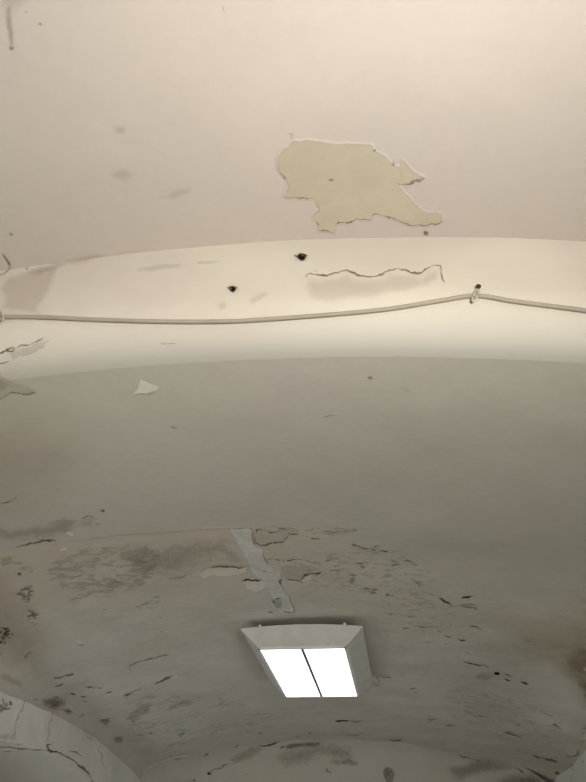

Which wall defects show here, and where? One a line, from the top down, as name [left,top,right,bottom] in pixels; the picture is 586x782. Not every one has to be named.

peeling [274,133,446,236]
peeling [0,375,36,400]
crack [0,698,106,782]